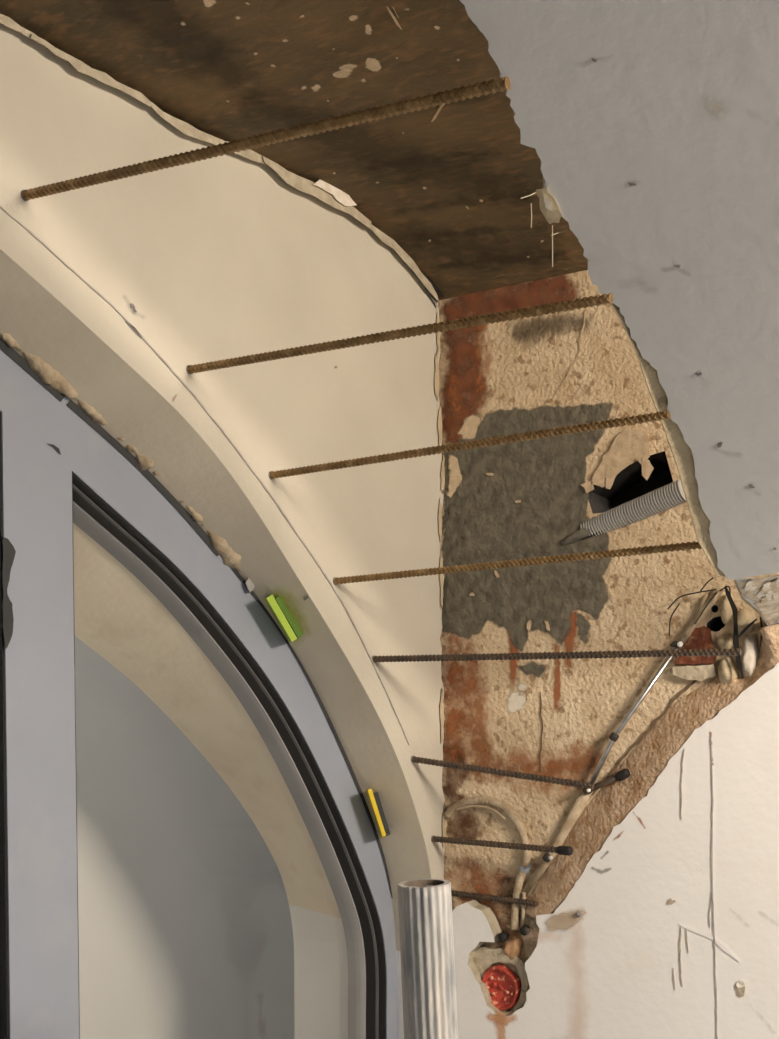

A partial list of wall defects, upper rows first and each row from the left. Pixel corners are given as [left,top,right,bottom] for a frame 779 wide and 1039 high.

flaking render [0,14,725,606]
flaking render [737,575,779,625]
spalling [372,626,742,665]
rust [554,612,577,710]
rust [443,631,602,792]
spalling [411,756,594,790]
spalling [431,805,573,856]
rust [448,864,511,926]
spalling [451,890,538,907]
crack [673,732,718,1039]
rust [488,1012,514,1039]